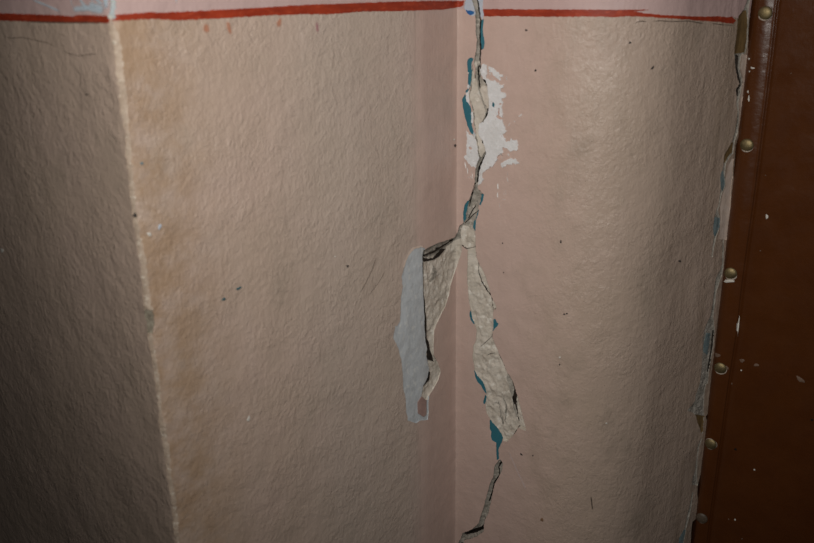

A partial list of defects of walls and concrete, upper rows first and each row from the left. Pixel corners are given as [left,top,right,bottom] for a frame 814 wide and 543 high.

peeling [464,0,485,49]
peeling [462,58,476,137]
crack [458,0,489,233]
flaking render [393,194,526,460]
crack [459,460,503,543]